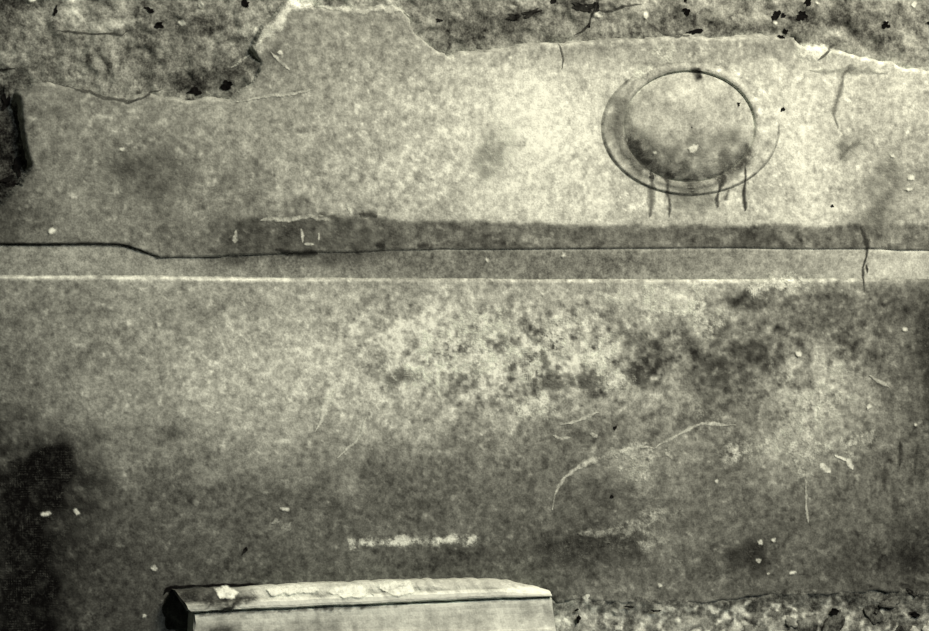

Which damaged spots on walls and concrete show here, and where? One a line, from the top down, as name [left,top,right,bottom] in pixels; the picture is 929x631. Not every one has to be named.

spalling [0,0,929,202]
damp [650,160,673,217]
damp [715,155,747,211]
peeling [261,214,329,245]
peeling [644,285,724,333]
peeling [748,276,805,296]
crack [860,226,869,291]
damp [0,421,110,631]
spalling [552,588,929,631]